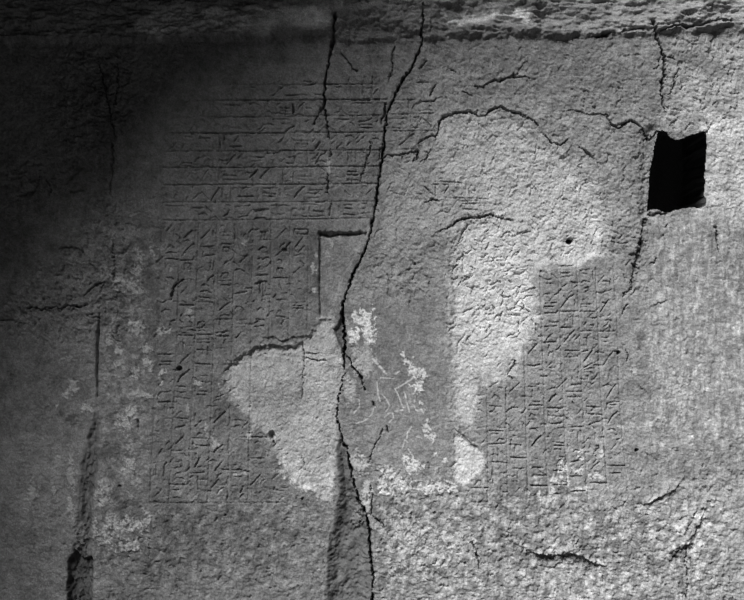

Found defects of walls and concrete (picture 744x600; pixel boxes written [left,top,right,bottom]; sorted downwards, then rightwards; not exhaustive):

crack [591,11,734,113]
crack [565,109,659,142]
crack [301,2,596,600]
crack [611,211,669,316]